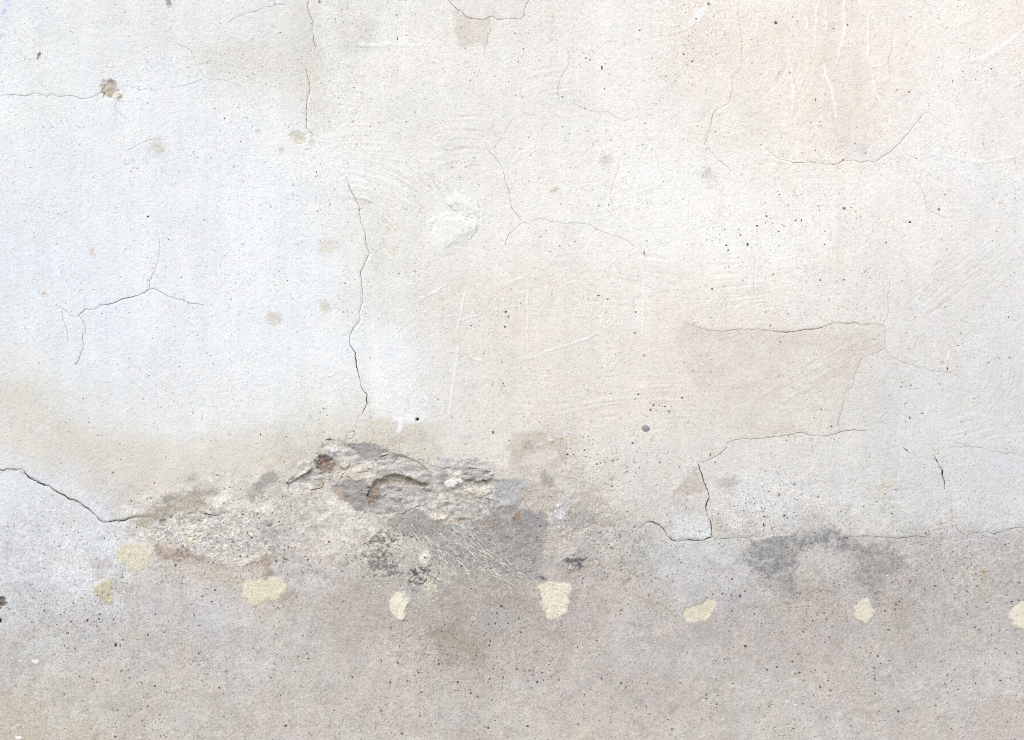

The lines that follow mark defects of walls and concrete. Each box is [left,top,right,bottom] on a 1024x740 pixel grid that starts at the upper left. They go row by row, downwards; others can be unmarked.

crack [59,246,204,365]
crack [639,283,960,541]
crack [0,468,137,522]
leakage [130,469,220,531]
flaking render [143,436,499,562]
crack [851,440,1024,538]
leakage [152,513,295,595]
leakage [280,424,682,698]
leakage [737,524,913,612]